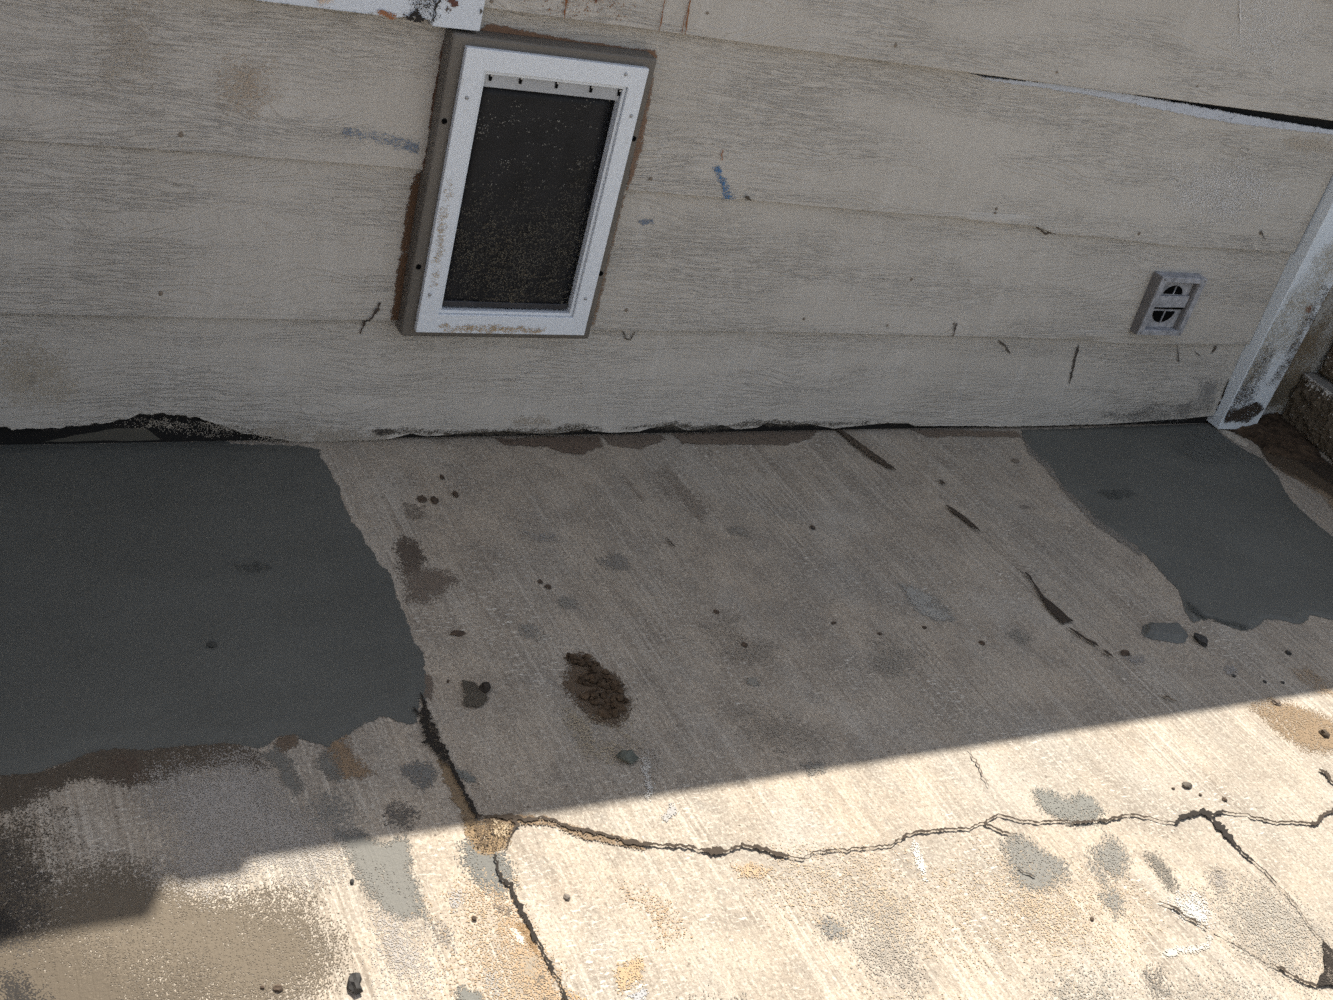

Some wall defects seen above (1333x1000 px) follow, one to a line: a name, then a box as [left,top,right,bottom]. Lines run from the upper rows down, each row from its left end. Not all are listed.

peeling [403,0,459,24]
water stain [1242,241,1333,460]
water stain [1098,374,1258,467]
water stain [392,534,464,609]
water stain [0,734,484,1000]
water stain [454,836,520,917]
crack [413,692,1333,1000]